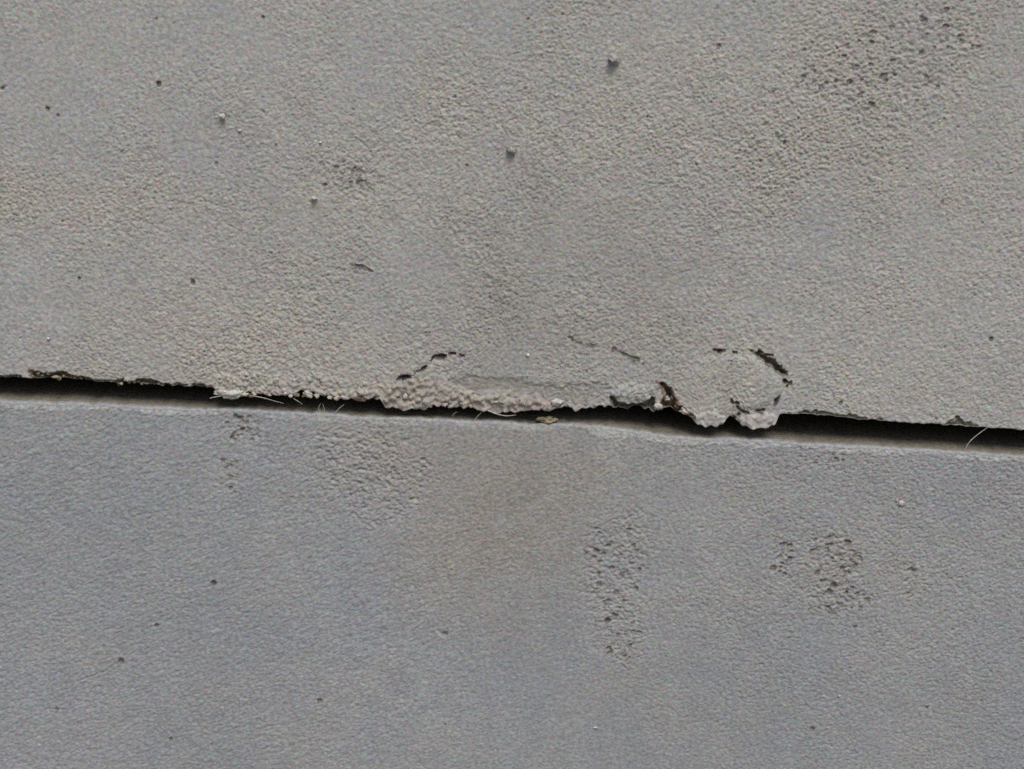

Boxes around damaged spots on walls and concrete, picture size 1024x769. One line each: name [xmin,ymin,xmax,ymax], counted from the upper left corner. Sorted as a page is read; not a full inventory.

crack [396,352,465,381]
peeling [213,354,784,429]
crack [712,348,793,418]